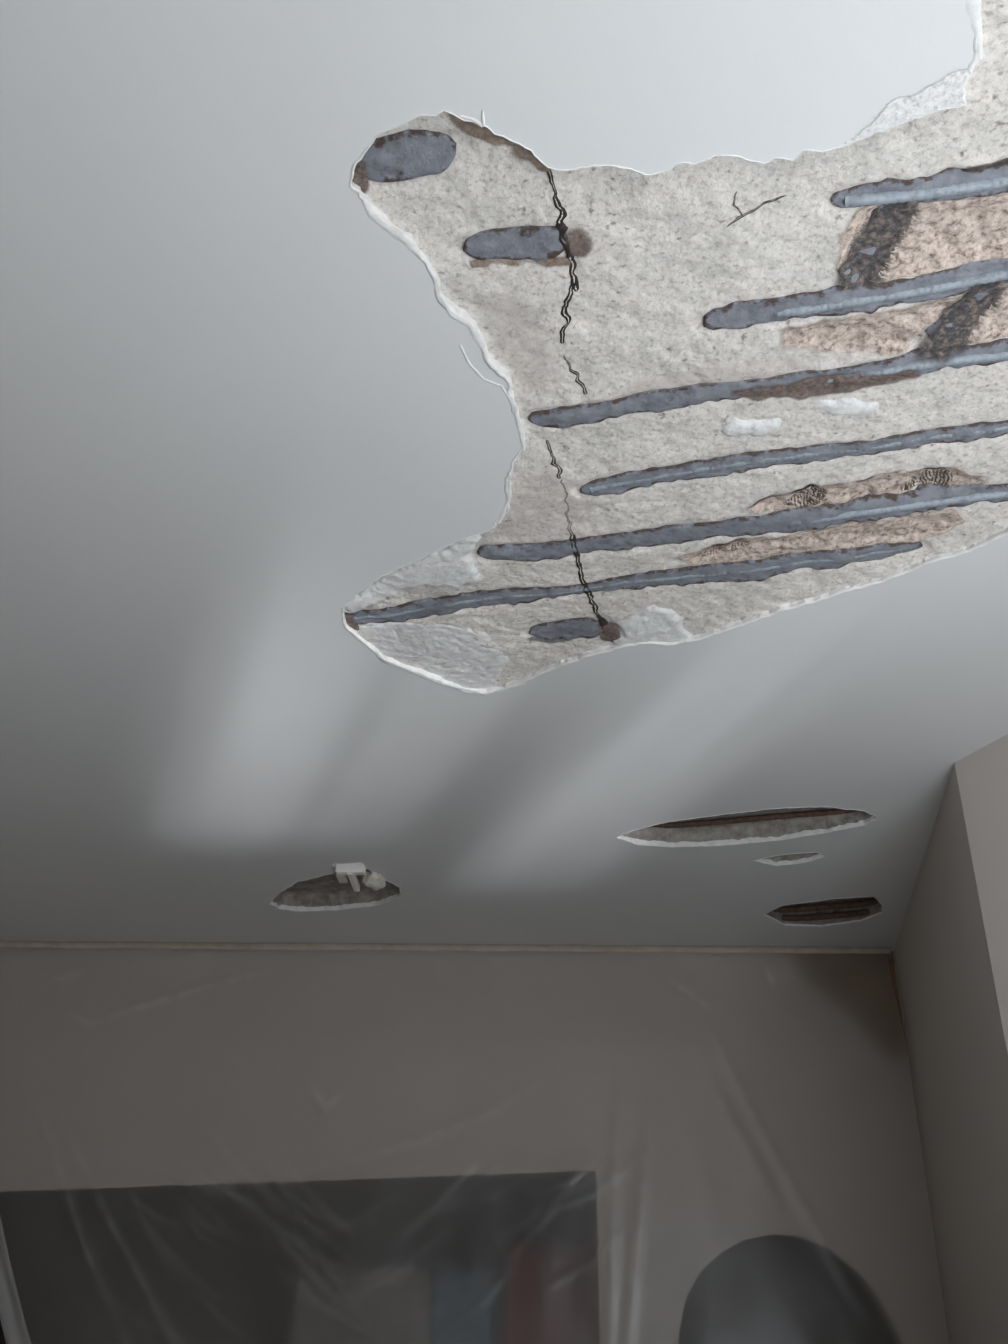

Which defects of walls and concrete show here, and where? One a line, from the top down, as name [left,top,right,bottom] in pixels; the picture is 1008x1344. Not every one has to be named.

crack [547,169,587,395]
spalling [341,0,1008,696]
crack [546,440,608,627]
spalling [267,862,401,912]
spalling [615,806,878,866]
spalling [764,896,882,927]